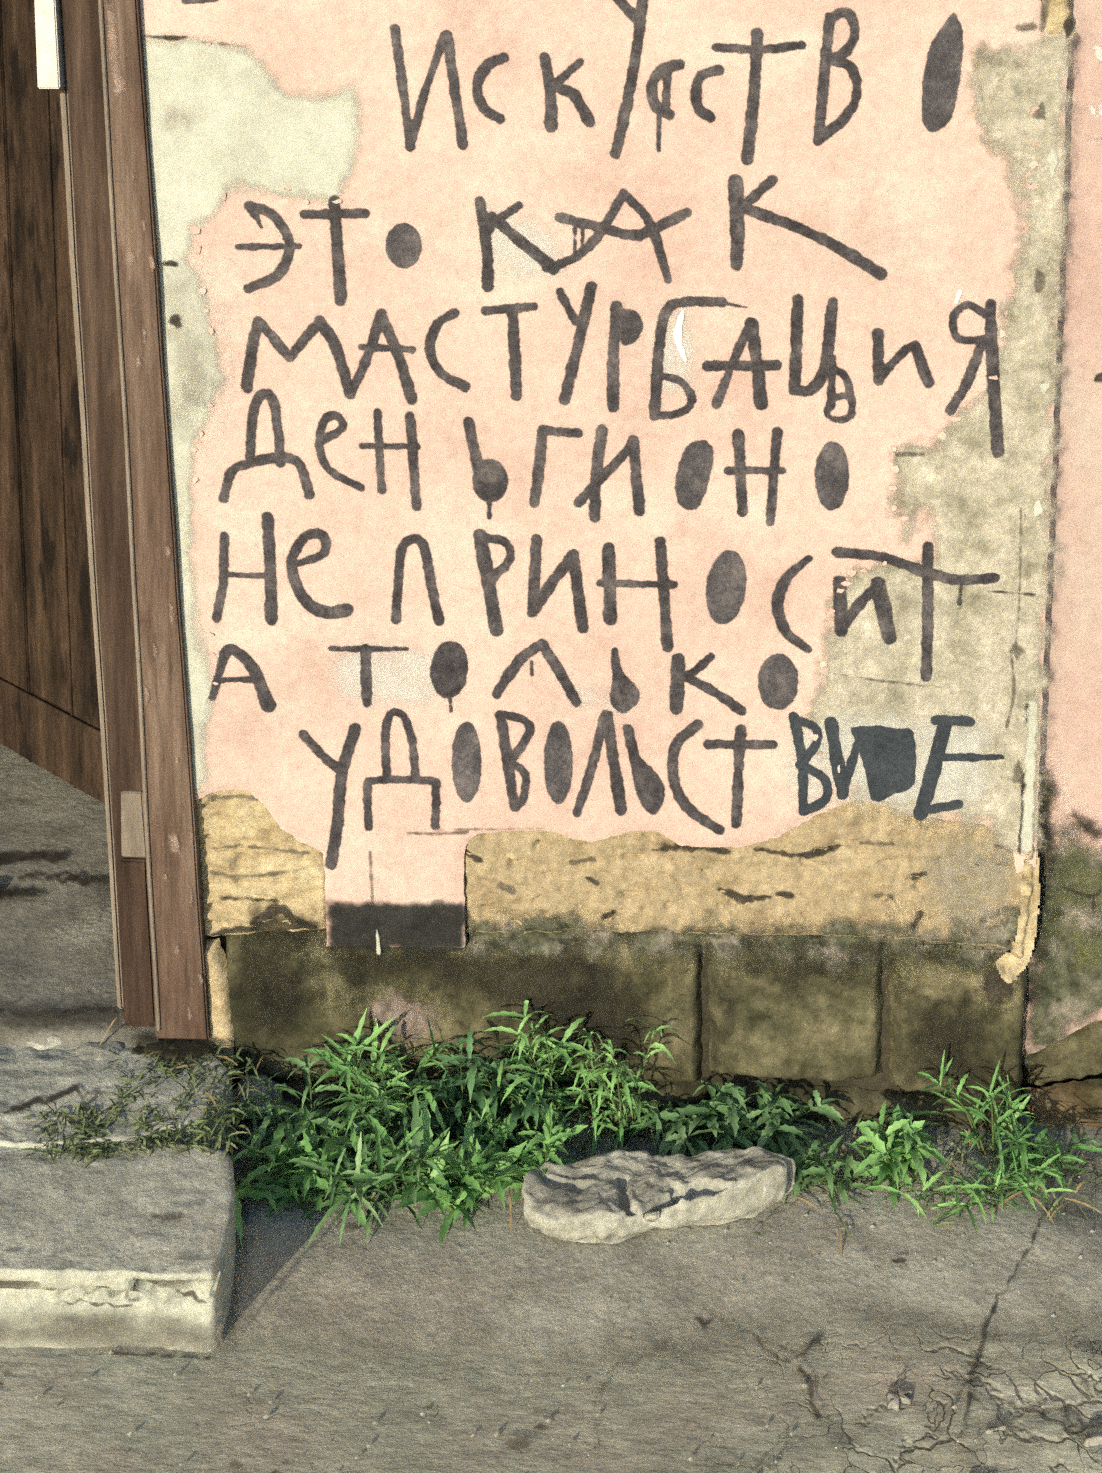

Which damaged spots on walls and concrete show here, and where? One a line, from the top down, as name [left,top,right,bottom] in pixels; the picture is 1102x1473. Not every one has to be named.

peeling [106,0,122,94]
peeling [129,35,360,936]
peeling [464,0,1075,983]
water stain [1037,788,1054,900]
crack [696,1317,711,1327]
crack [754,1335,830,1419]
crack [959,1208,1100,1462]
crack [717,1459,777,1470]